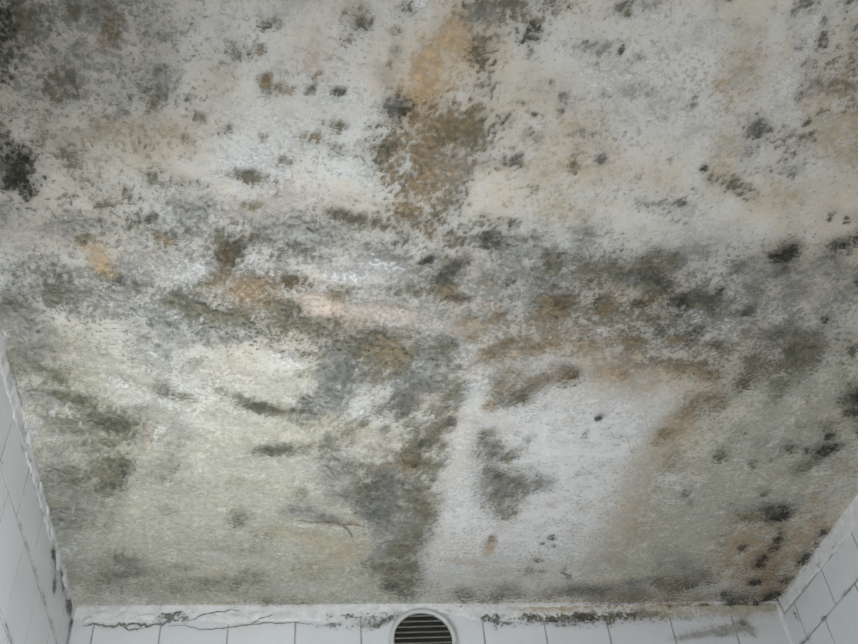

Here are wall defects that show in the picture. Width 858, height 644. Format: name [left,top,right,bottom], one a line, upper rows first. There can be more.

water stain [203,38,267,80]
water stain [256,72,295,98]
water stain [303,72,370,135]
water stain [333,1,375,48]
water stain [452,0,560,100]
water stain [557,40,726,142]
water stain [699,0,858,202]
water stain [200,105,347,197]
water stain [635,188,694,225]
water stain [464,429,557,526]
crack [83,609,313,631]
water stain [676,619,756,640]